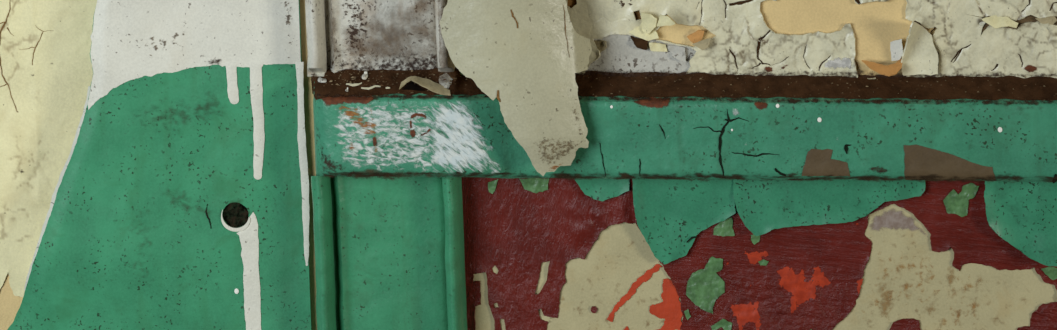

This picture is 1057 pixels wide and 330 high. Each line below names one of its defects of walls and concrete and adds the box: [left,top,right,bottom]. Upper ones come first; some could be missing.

crack [0,9,50,111]
crack [697,0,753,25]
crack [729,30,831,72]
peeling [760,0,939,76]
crack [914,21,971,67]
peeling [0,0,312,330]
crack [693,111,786,176]
peeling [904,145,996,181]
peeling [473,266,506,330]
peeling [535,261,550,294]
peeling [538,222,683,330]
peeling [833,204,1057,330]